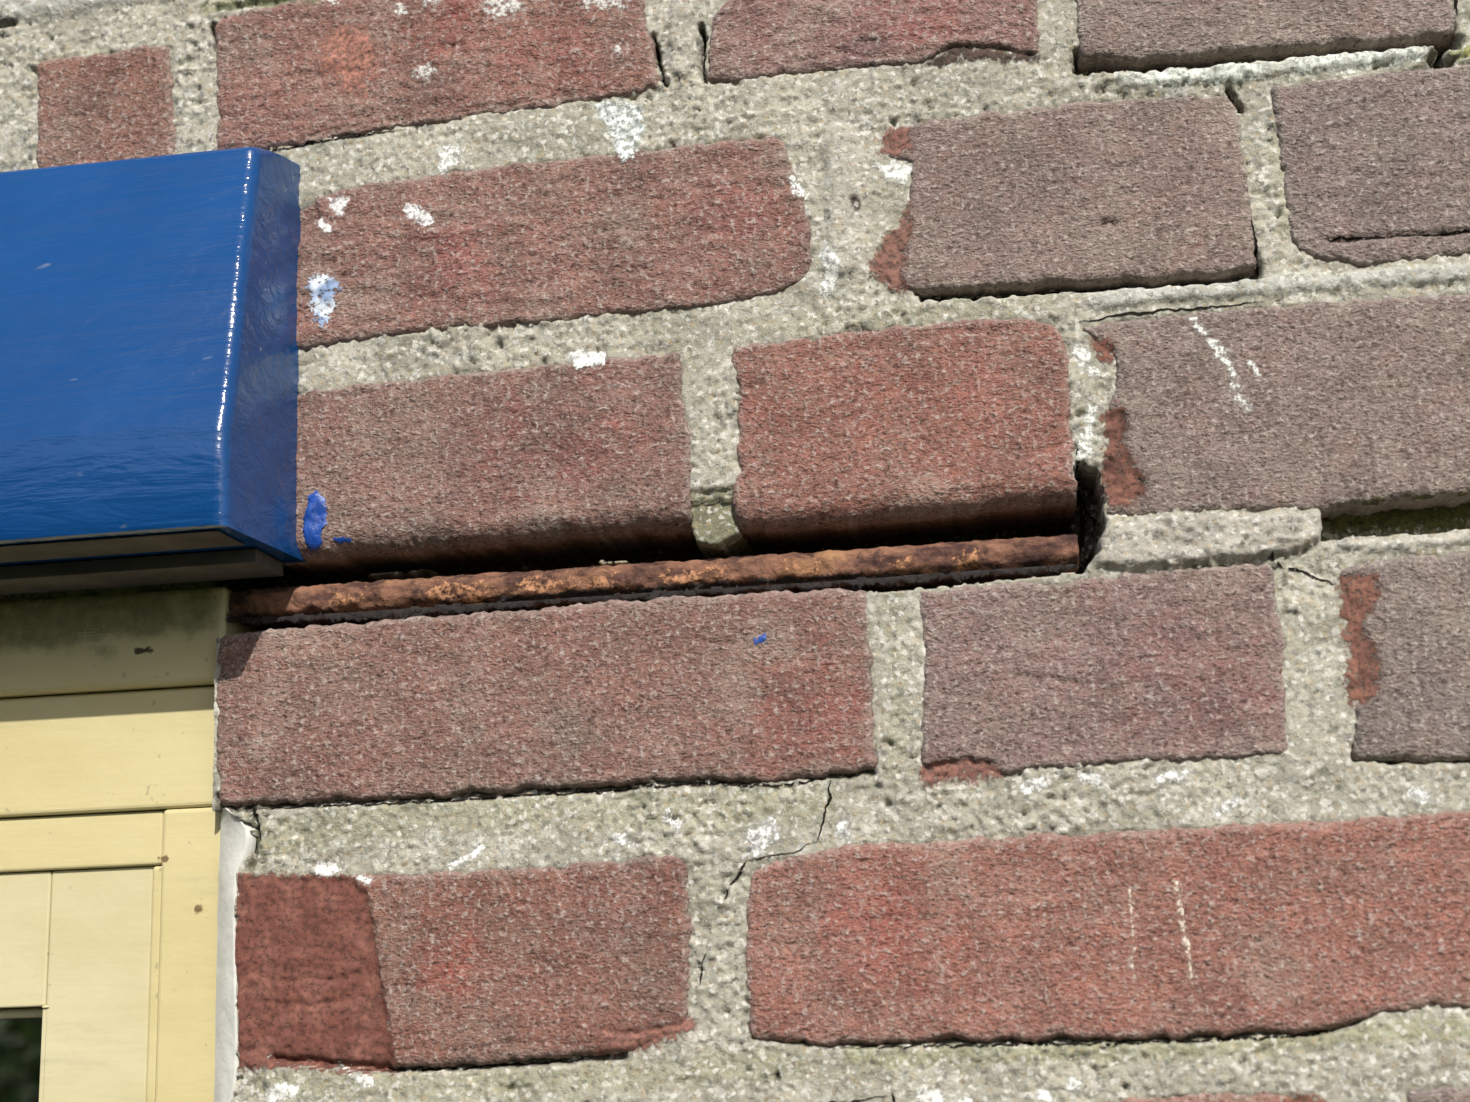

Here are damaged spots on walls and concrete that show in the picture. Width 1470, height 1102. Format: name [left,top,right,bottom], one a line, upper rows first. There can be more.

crack [652,39,668,88]
crack [700,22,708,83]
spalling [875,126,913,158]
spalling [869,199,915,294]
crack [1316,228,1470,241]
corrosion [329,574,393,611]
corrosion [420,550,729,605]
corrosion [758,529,1064,579]
spalling [1335,573,1385,707]
crack [235,773,871,901]